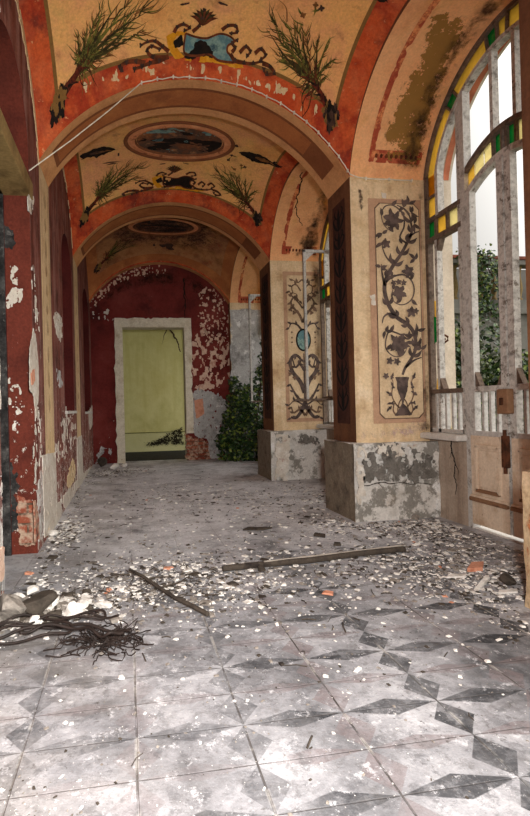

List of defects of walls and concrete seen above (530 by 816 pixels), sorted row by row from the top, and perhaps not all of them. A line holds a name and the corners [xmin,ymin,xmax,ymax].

crack [293,172,303,224]
peeling [91,265,166,321]
spalling [184,287,231,460]
peeling [0,265,112,596]
crack [450,441,459,494]